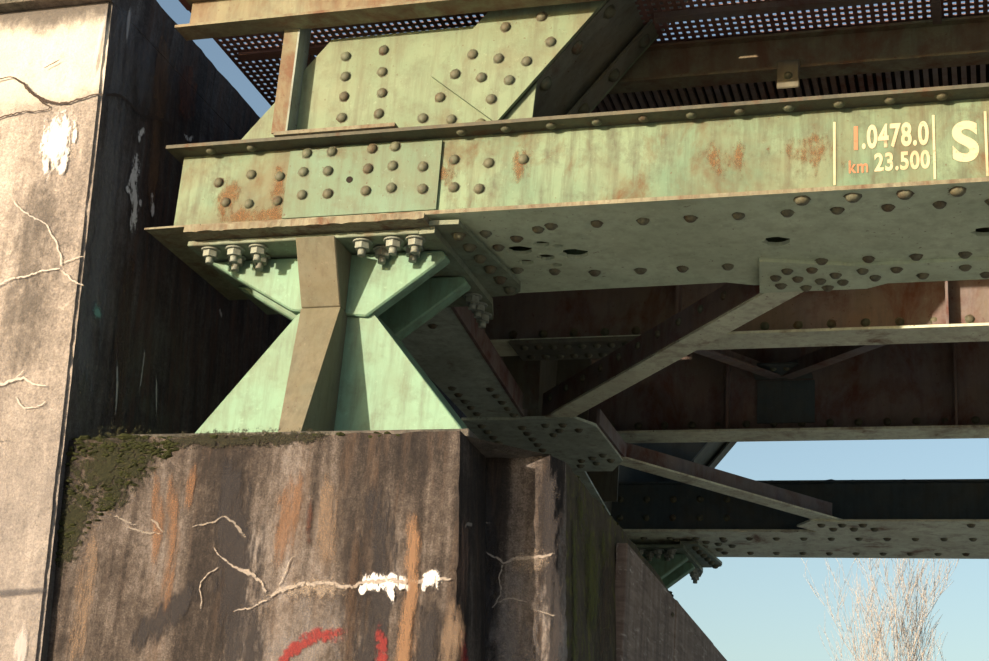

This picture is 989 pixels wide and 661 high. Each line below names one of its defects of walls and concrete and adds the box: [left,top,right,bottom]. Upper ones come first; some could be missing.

leakage [39,110,77,177]
crack [0,76,176,145]
leakage [78,8,154,378]
corrosion [217,184,282,222]
crack [0,198,84,285]
crack [0,370,46,409]
leakage [130,584,201,649]
crack [192,516,246,538]
leakage [212,458,408,661]
crack [199,548,451,612]
leakage [413,570,445,661]
crack [486,551,554,616]